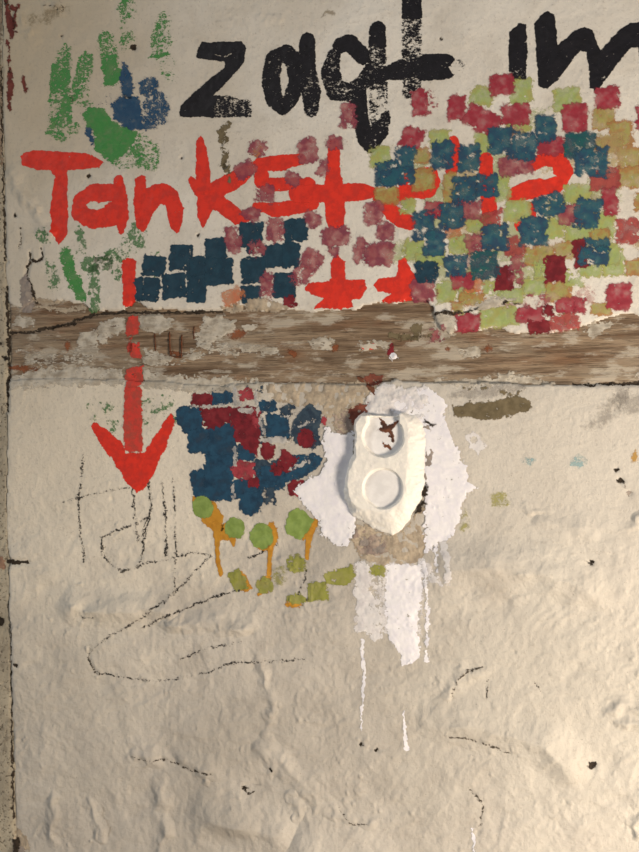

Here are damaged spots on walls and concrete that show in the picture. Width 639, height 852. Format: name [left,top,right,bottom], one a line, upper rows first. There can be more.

flaking render [12,274,87,329]
peeling [2,317,126,391]
flaking render [138,297,383,434]
flaking render [357,296,520,353]
peeling [458,346,481,359]
peeling [434,369,556,388]
peeling [583,320,614,339]
crack [9,624,17,819]